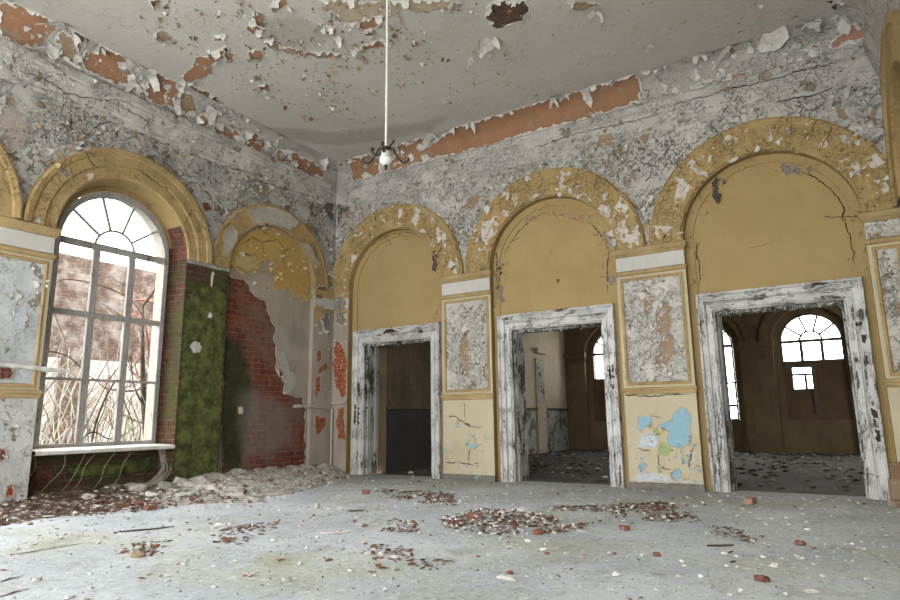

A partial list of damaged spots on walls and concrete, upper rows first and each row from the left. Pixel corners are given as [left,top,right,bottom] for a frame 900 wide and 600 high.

crack [19,55,159,172]
flaking render [0,0,892,484]
crack [531,59,869,295]